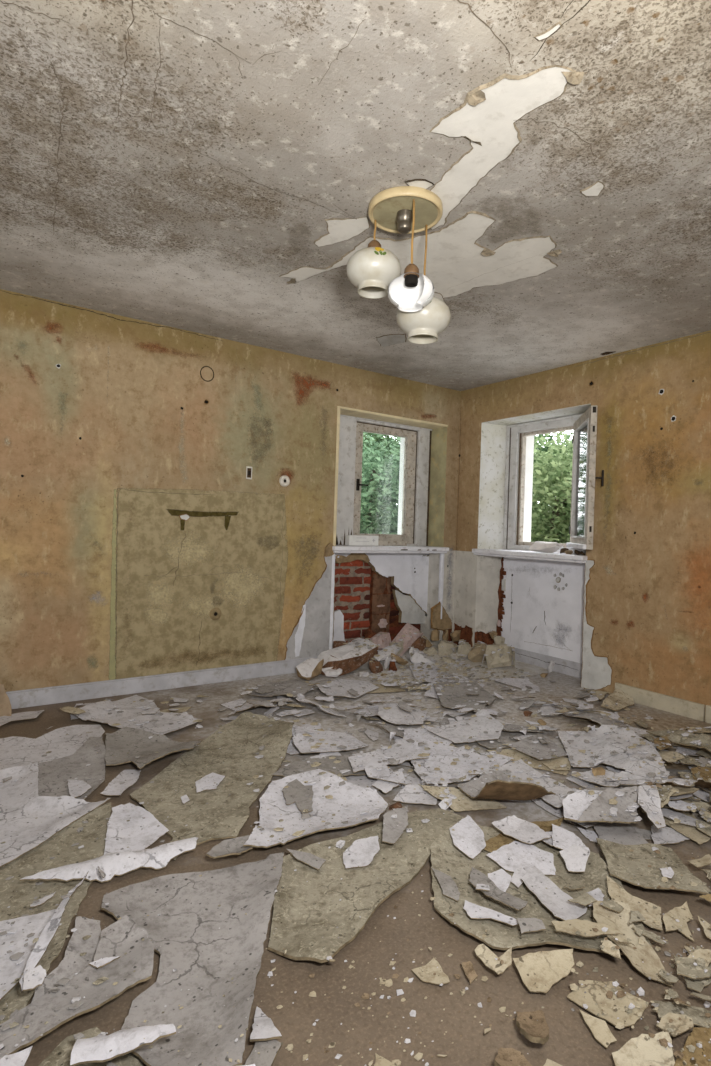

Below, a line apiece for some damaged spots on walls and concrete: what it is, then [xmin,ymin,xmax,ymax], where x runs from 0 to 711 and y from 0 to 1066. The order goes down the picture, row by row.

crack [457,0,604,68]
peeling [534,21,563,41]
crack [51,62,74,235]
peeling [279,65,584,301]
peeling [579,181,605,197]
corrosion [295,374,329,405]
flaking render [285,543,370,660]
peeling [353,683,439,741]
flaking render [393,559,711,881]
peeling [342,756,711,1001]